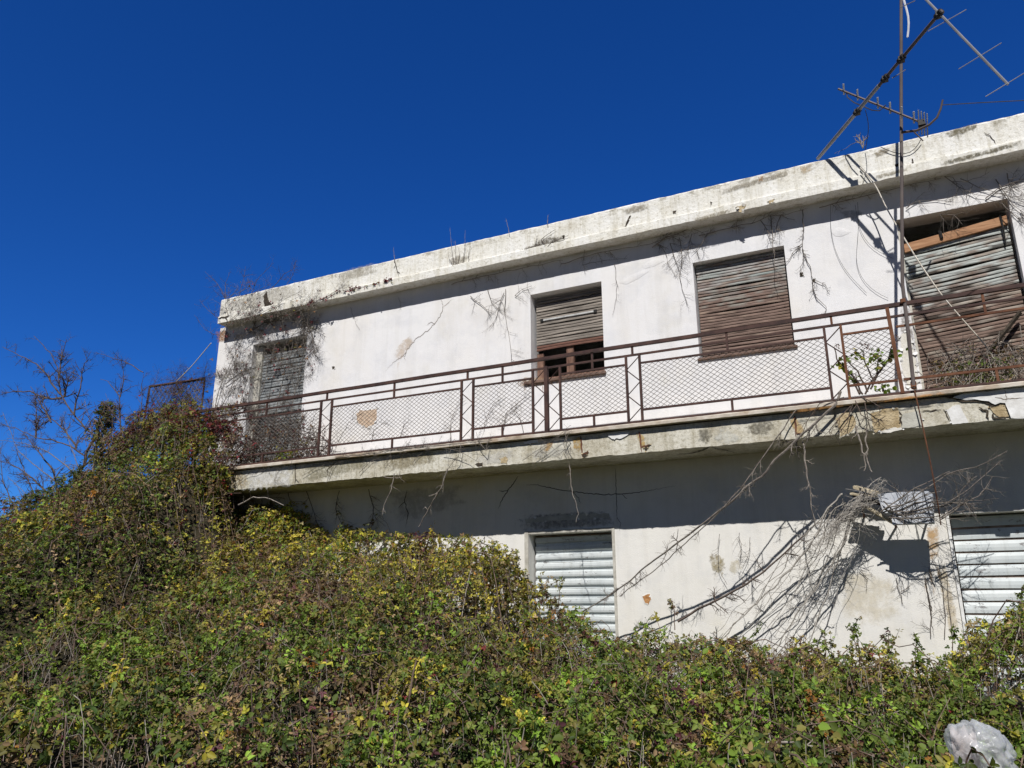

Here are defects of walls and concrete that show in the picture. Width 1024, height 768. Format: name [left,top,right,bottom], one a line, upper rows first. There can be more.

crack [388,301,450,368]
peeling [356,407,378,429]
spalling [834,410,858,438]
spalling [869,406,904,434]
peeling [945,404,969,424]
spalling [988,404,1009,417]